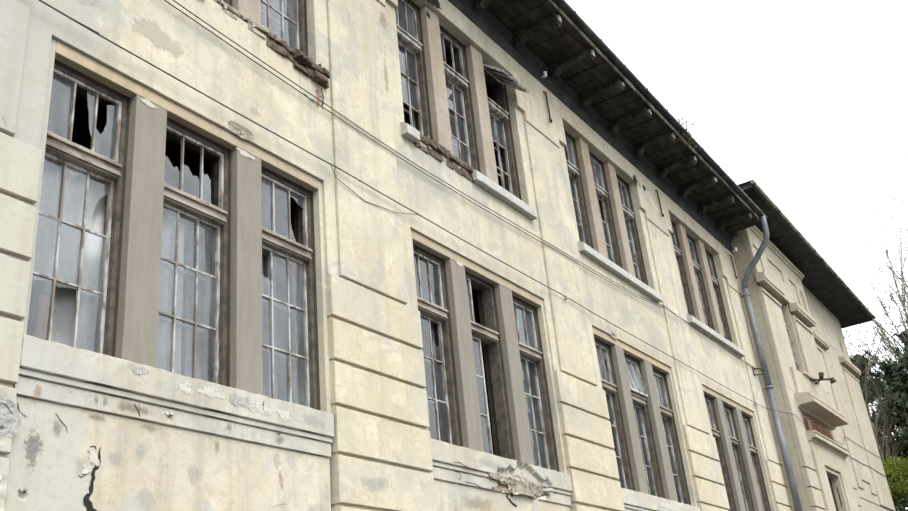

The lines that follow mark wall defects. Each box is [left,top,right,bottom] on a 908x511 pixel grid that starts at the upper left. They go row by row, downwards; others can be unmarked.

spalling [213,0,330,109]
spalling [413,131,474,183]
peeling [178,380,257,410]
spalling [0,395,43,471]
crack [78,446,101,511]
spalling [489,467,553,498]